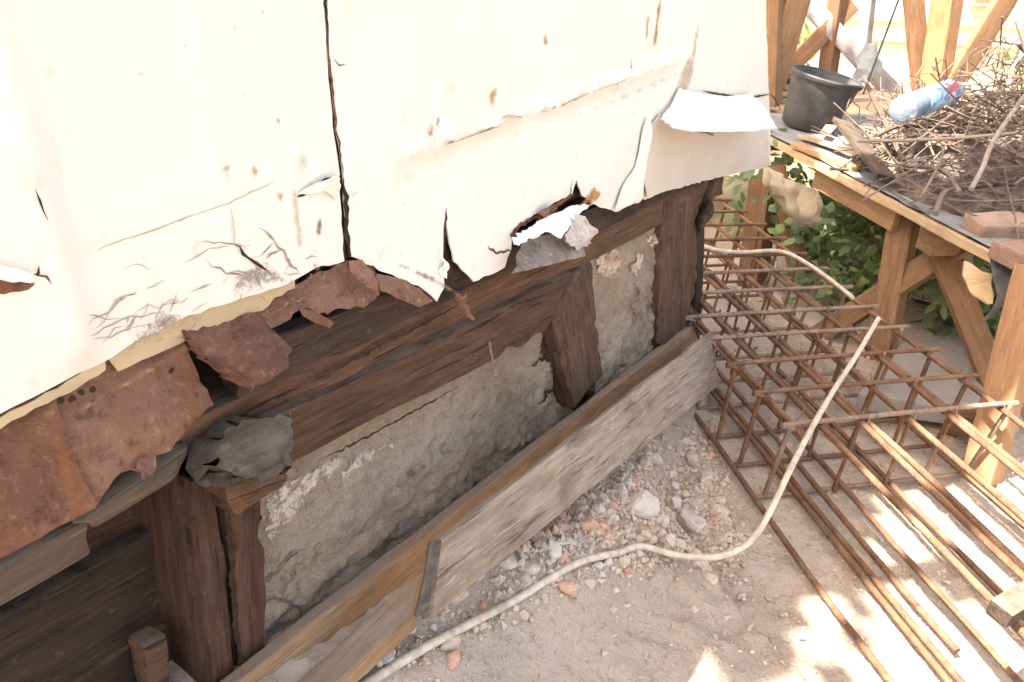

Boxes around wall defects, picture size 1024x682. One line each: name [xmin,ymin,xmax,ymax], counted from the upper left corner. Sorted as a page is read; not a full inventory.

crack [297,0,351,259]
peeling [537,205,557,218]
crack [89,182,323,356]
peeling [438,256,450,279]
peeling [596,235,658,278]
rust [0,259,475,558]
crack [318,388,457,461]